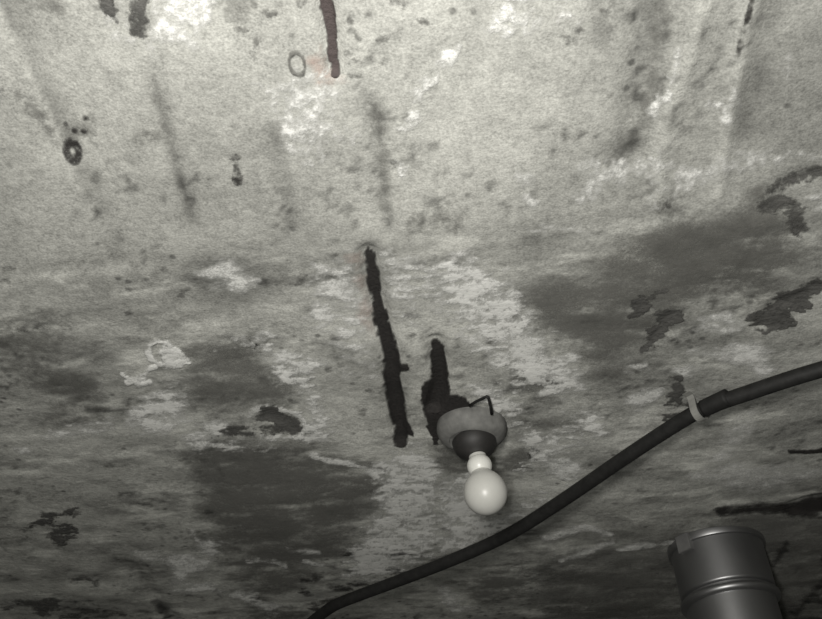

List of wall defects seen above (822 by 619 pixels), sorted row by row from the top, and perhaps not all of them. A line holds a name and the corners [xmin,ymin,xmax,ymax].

spalling [129,0,149,37]
crack [744,5,752,22]
leakage [266,69,355,166]
leakage [576,151,765,202]
spalling [758,165,822,235]
leakage [305,263,375,378]
crack [365,247,472,448]
leakage [379,187,798,486]
spalling [745,278,822,335]
spalling [219,406,302,436]
leakage [126,330,550,619]
spalling [714,496,822,517]